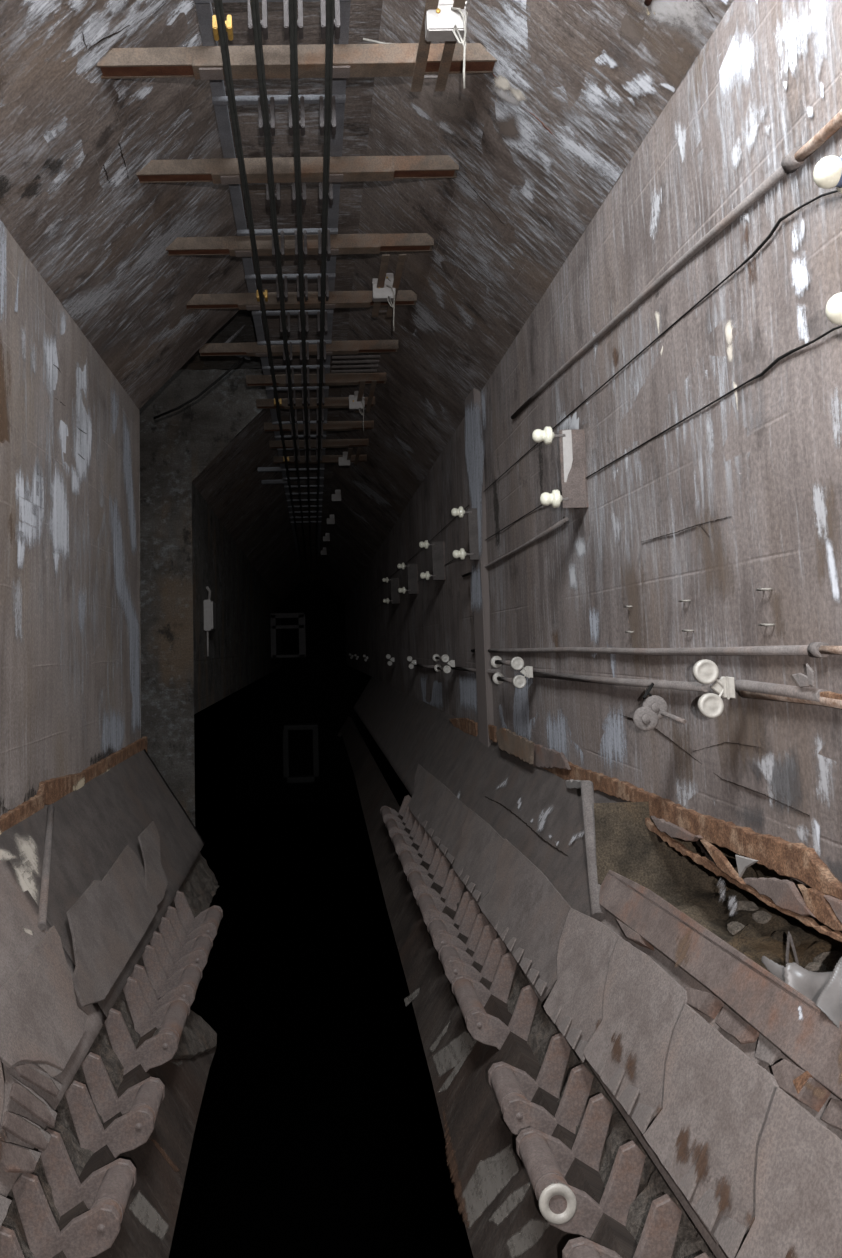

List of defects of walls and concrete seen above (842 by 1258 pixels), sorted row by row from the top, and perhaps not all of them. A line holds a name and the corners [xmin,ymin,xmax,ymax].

damp [20,0,198,105]
damp [401,0,675,337]
damp [675,125,700,162]
damp [707,34,806,196]
damp [13,109,204,765]
rust [818,487,834,573]
rust [717,694,761,765]
rust [0,736,148,835]
rust [449,718,842,942]
crack [696,841,717,866]
spalling [594,802,842,972]
rust [676,1129,730,1211]